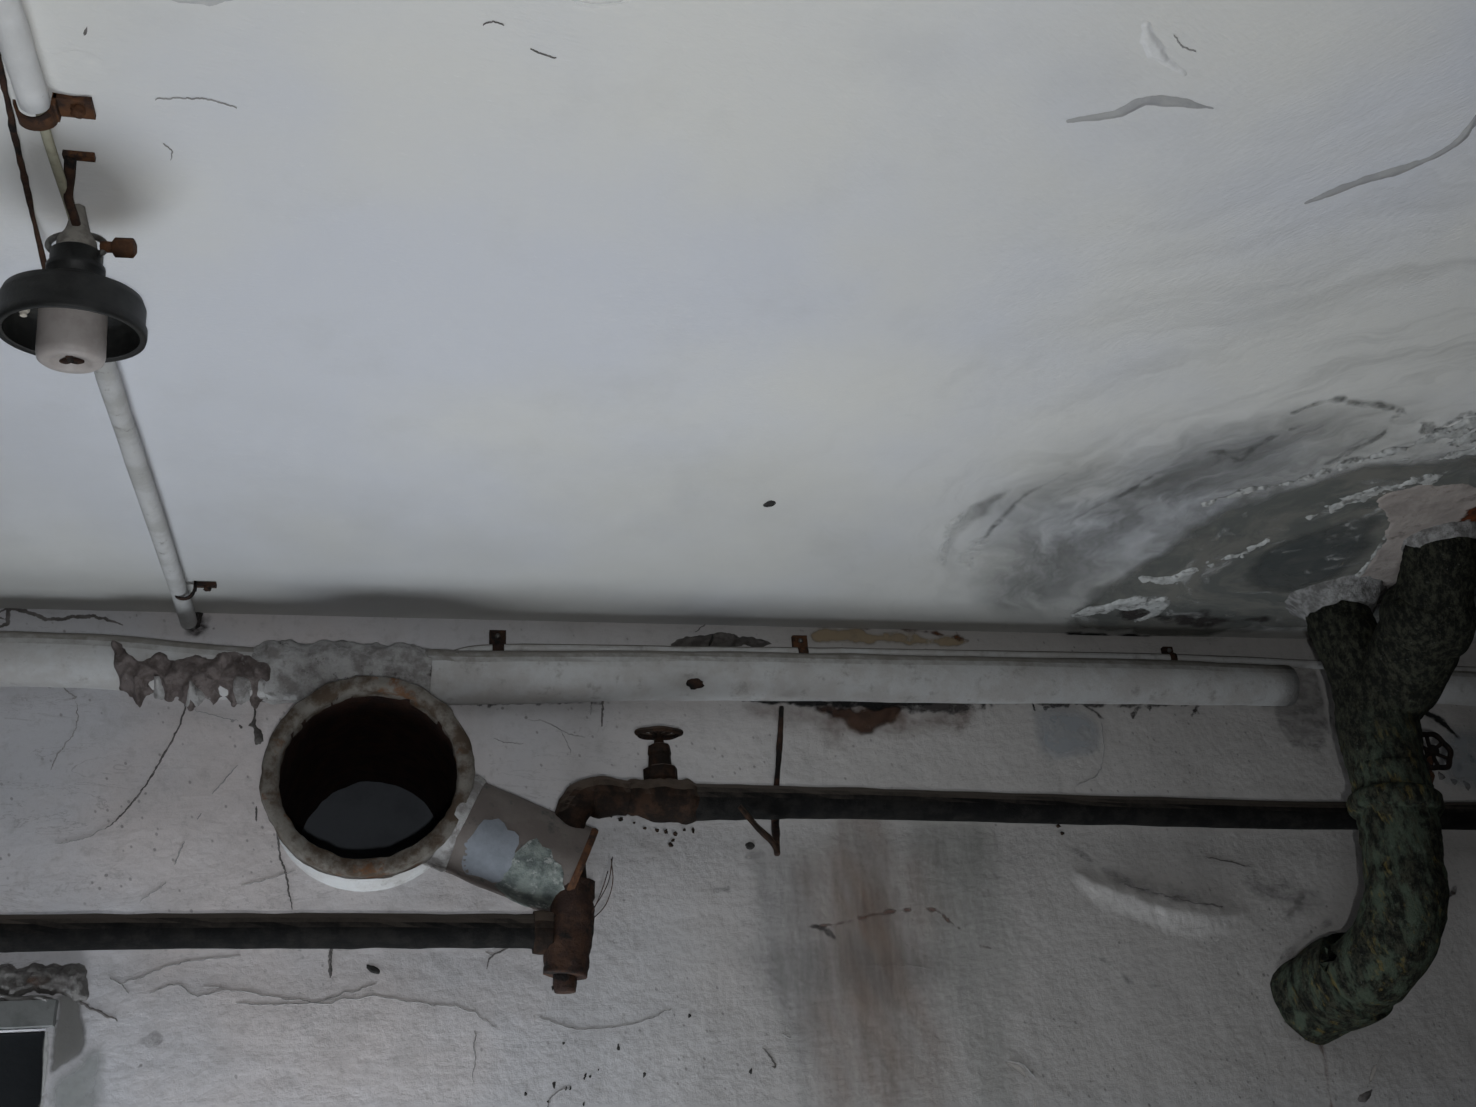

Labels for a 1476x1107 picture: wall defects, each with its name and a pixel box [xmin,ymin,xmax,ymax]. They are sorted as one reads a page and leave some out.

water stain [1074,455,1476,636]
spalling [0,963,89,1010]